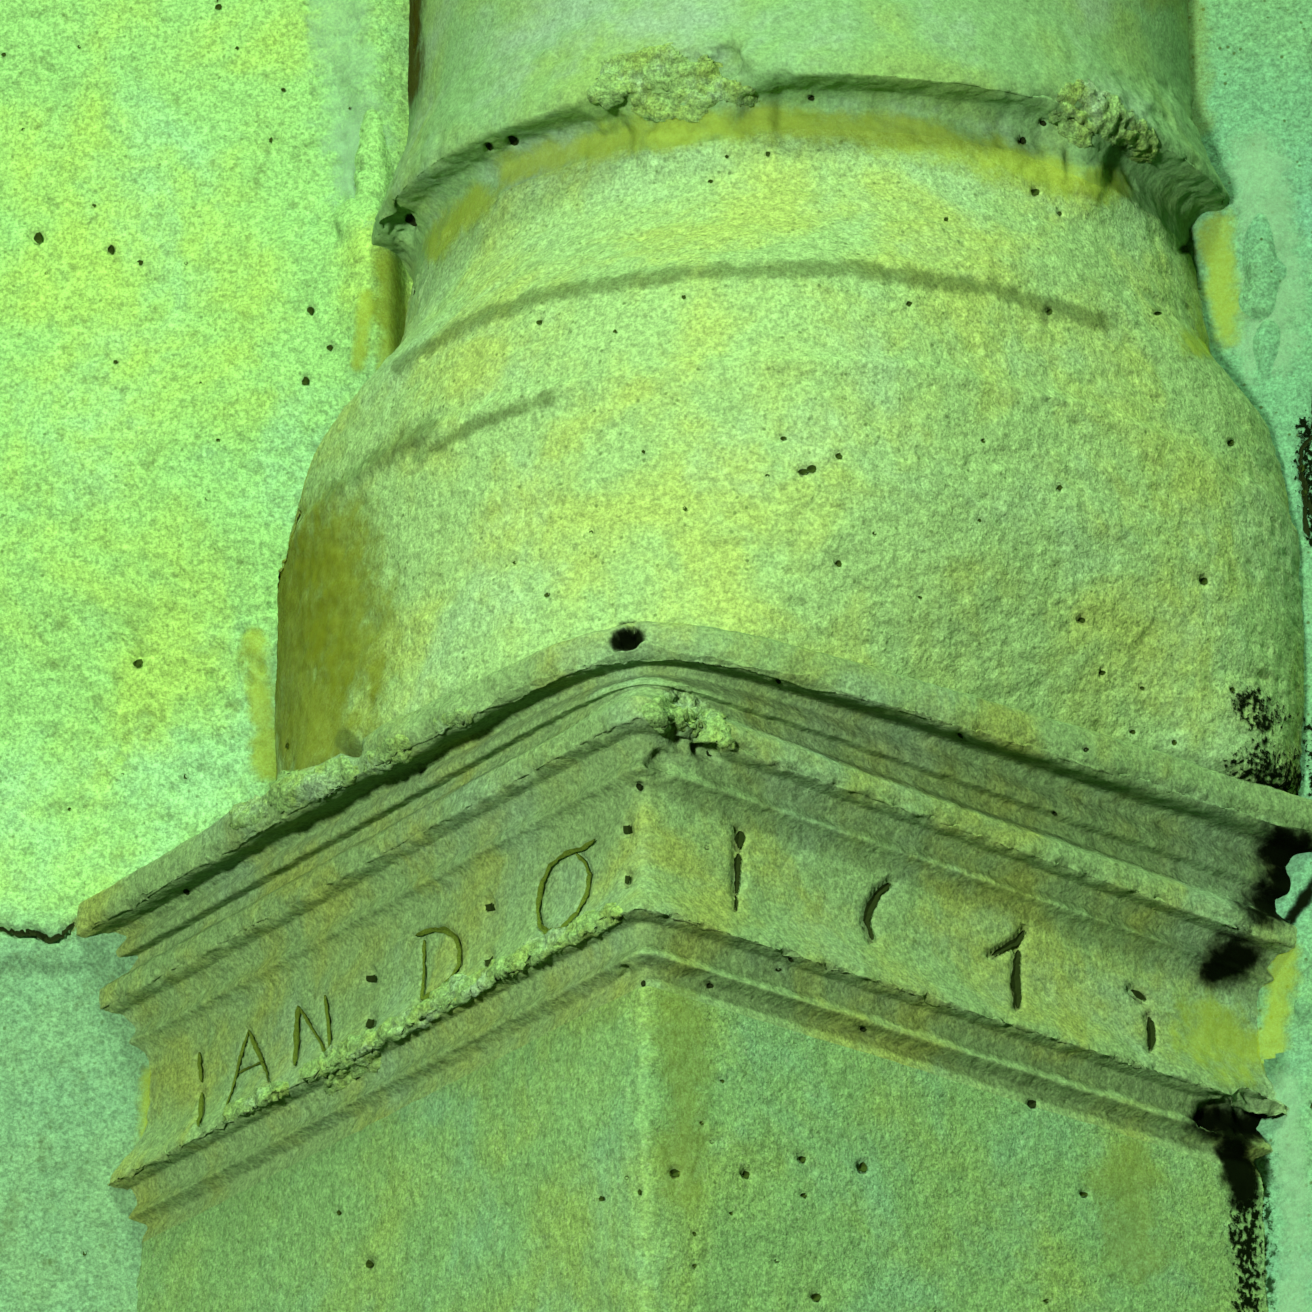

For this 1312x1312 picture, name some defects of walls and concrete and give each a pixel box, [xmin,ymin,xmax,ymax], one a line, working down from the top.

spalling [585,42,761,123]
spalling [1040,79,1160,164]
crack [1298,404,1312,537]
mould [1209,675,1312,796]
crack [0,922,75,944]
damp [1199,825,1312,985]
damp [1186,1103,1267,1312]